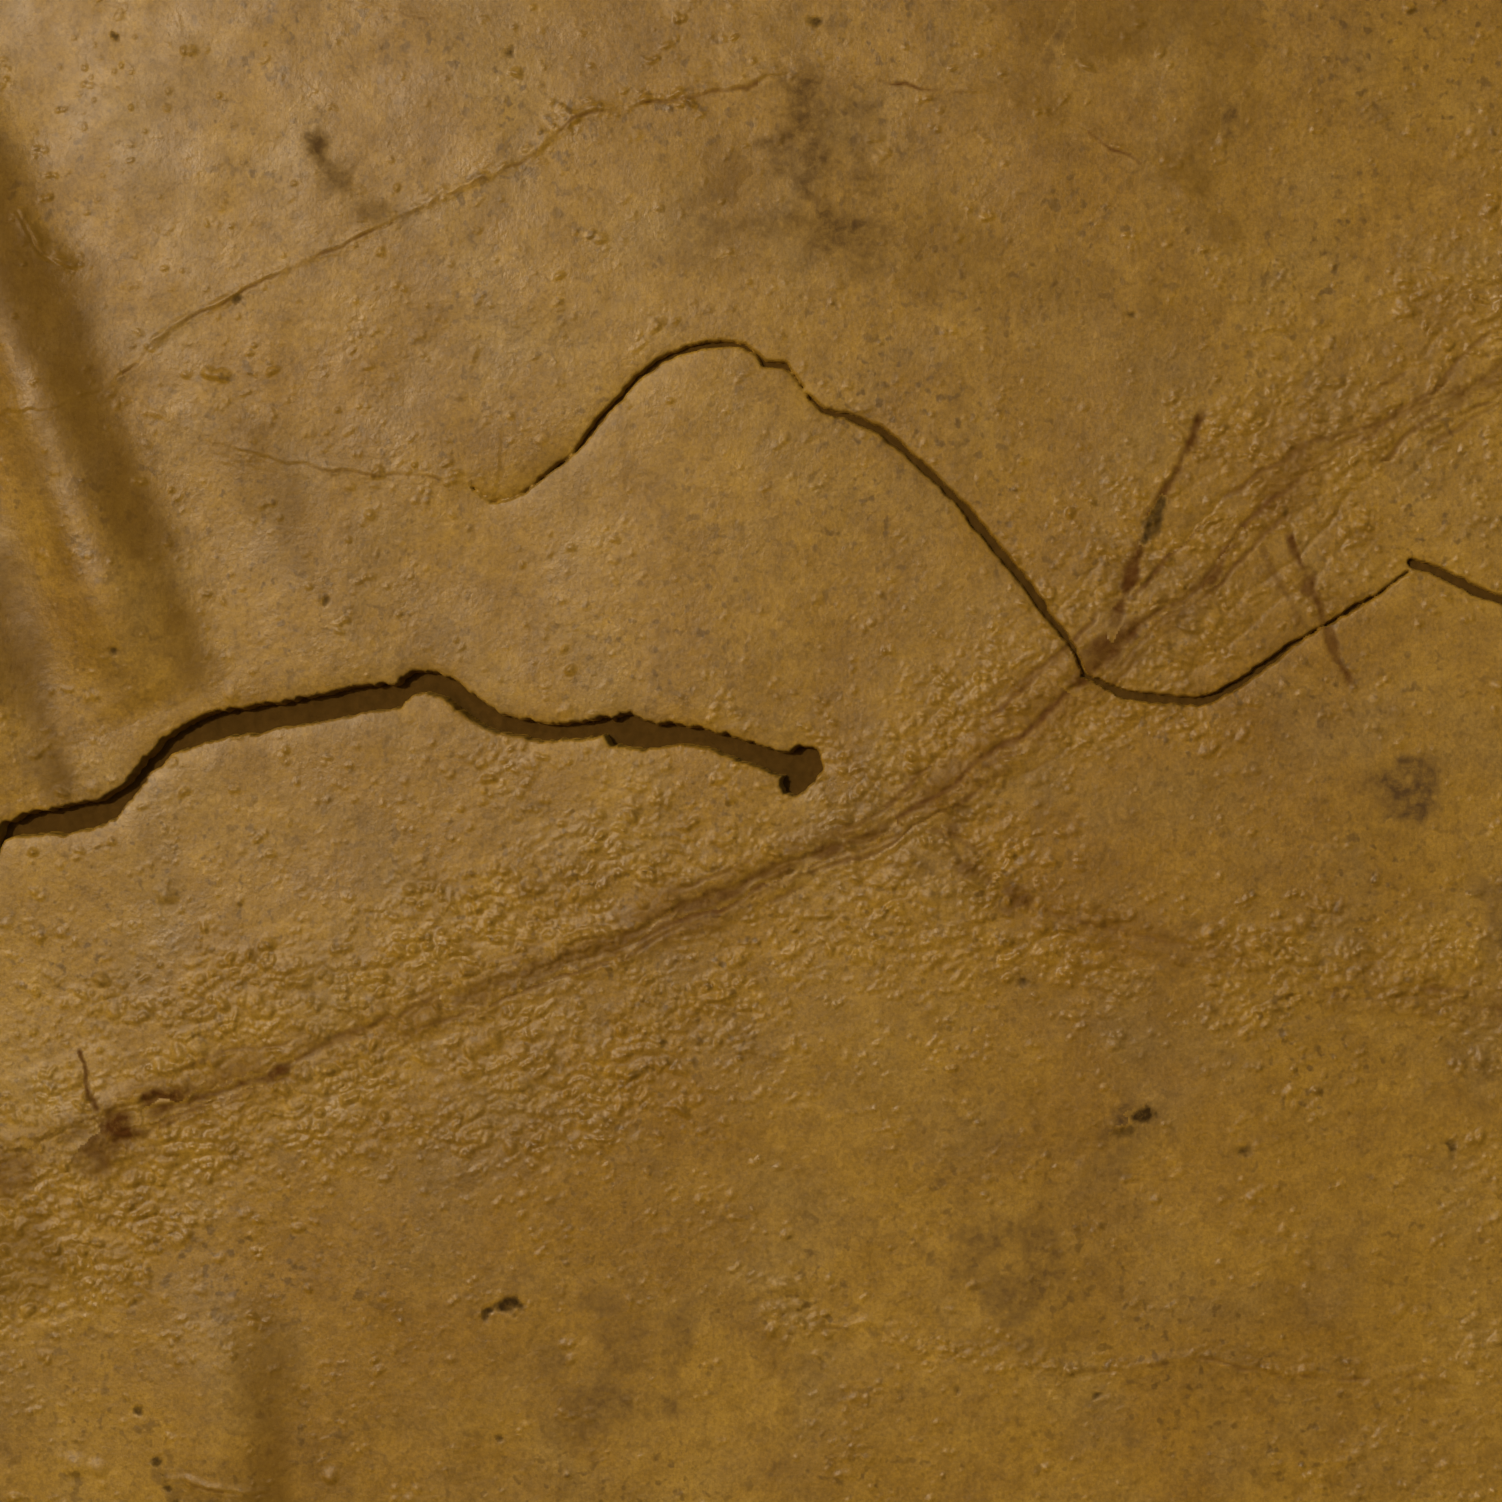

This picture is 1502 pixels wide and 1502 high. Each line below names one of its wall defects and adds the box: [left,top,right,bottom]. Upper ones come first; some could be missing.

crack [541,342,1502,706]
crack [1,673,823,847]